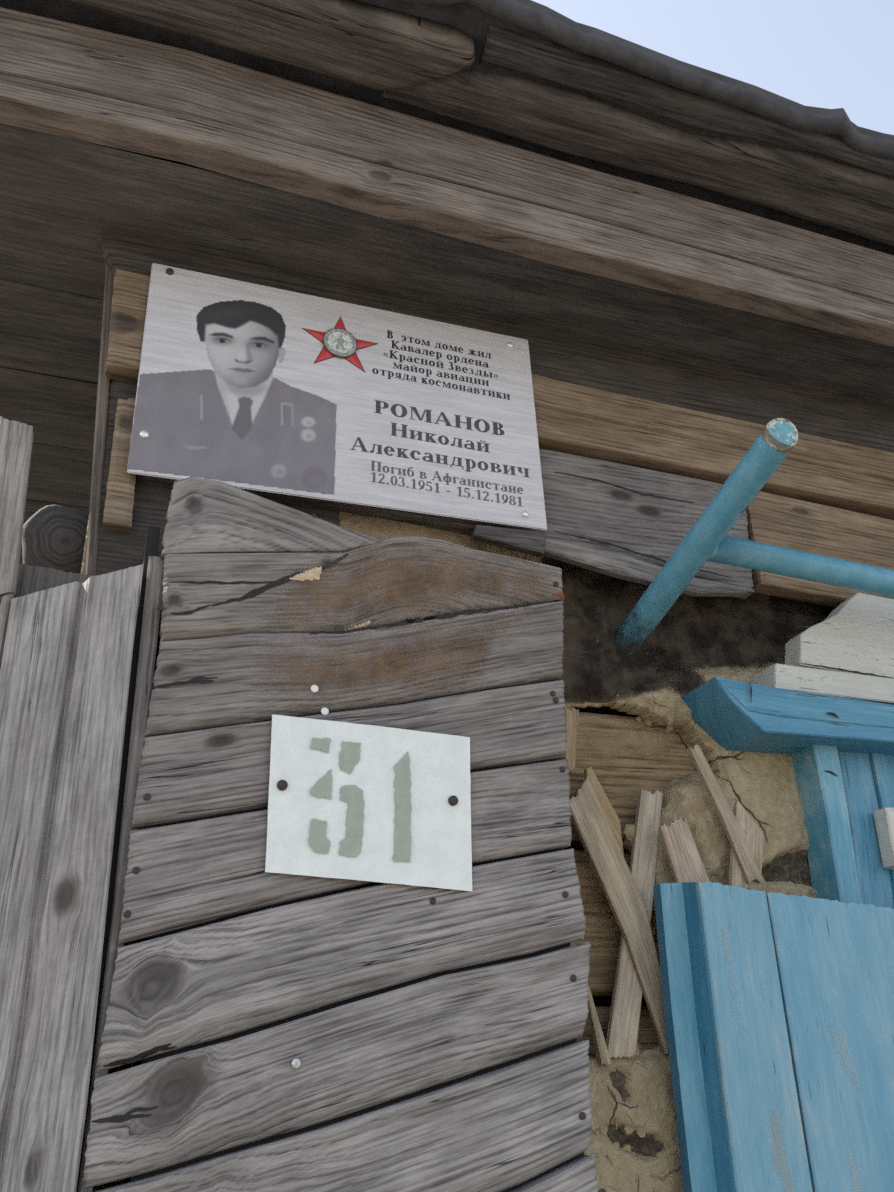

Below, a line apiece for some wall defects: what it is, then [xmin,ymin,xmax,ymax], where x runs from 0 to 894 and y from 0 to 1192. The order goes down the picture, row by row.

crack [167,553,349,615]
water stain [542,556,836,704]
spalling [592,715,677,756]
crack [643,725,771,842]
spalling [761,850,812,886]
crack [608,1086,638,1127]